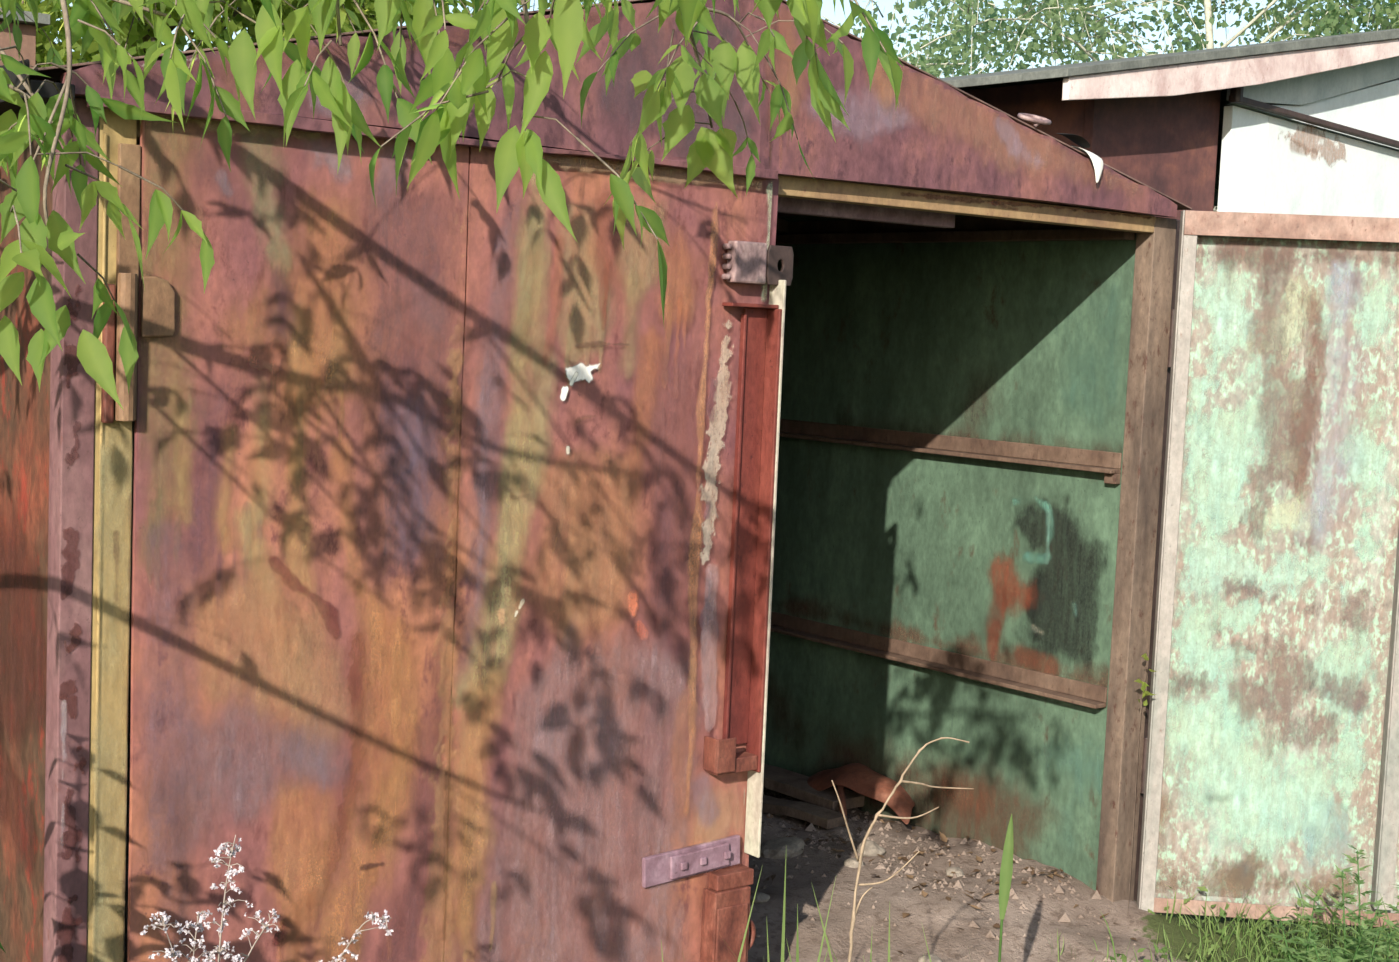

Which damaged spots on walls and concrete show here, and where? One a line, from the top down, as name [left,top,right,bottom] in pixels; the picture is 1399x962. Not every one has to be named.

peeling [560,363,599,401]
corrosion [664,249,689,319]
corrosion [697,207,717,469]
corrosion [1217,240,1326,527]
corrosion [269,557,370,947]
corrosion [457,405,544,706]
corrosion [628,592,648,638]
corrosion [674,499,702,813]
peeling [700,321,731,728]
corrosion [1202,856,1356,901]
corrosion [1232,650,1366,745]